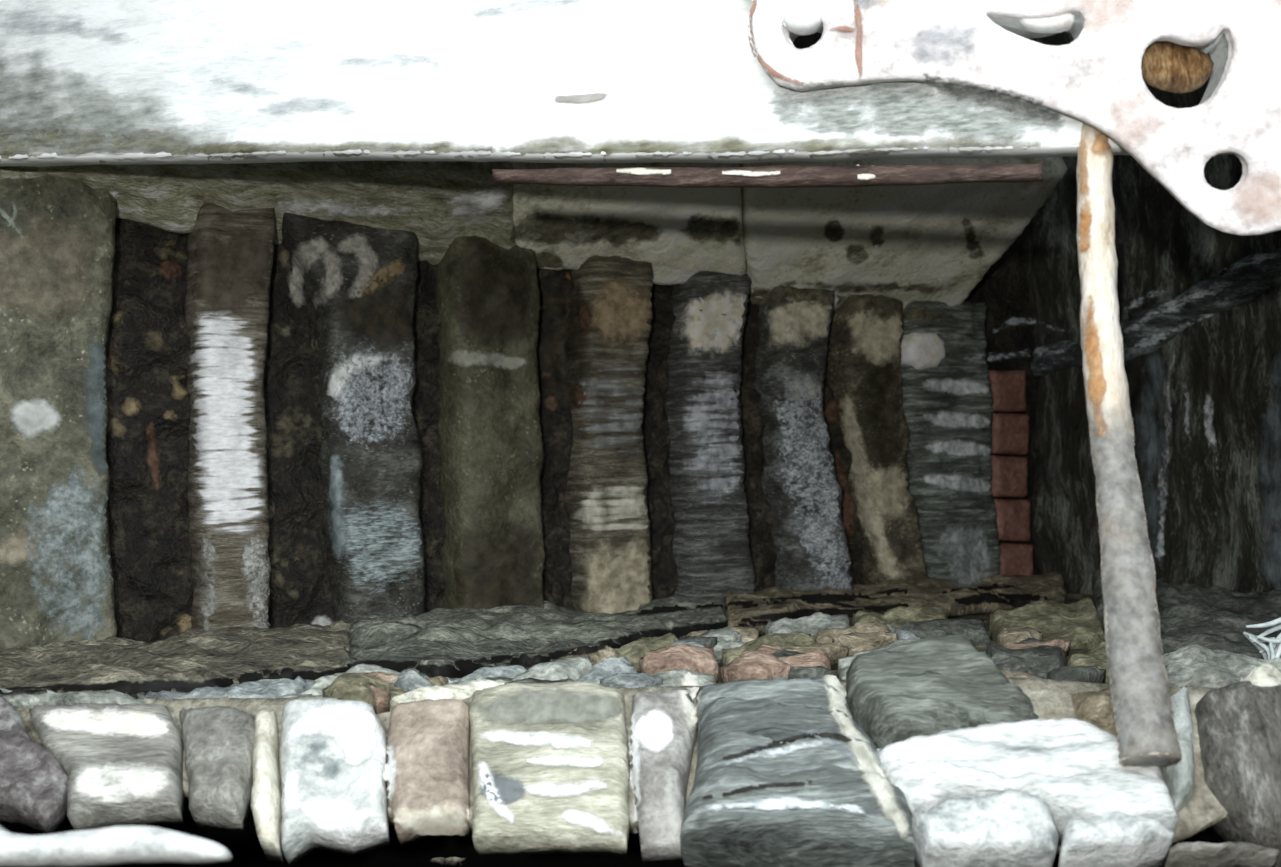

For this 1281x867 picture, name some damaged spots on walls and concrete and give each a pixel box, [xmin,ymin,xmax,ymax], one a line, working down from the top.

corrosion [1079,133,1111,252]
corrosion [1084,297,1107,438]